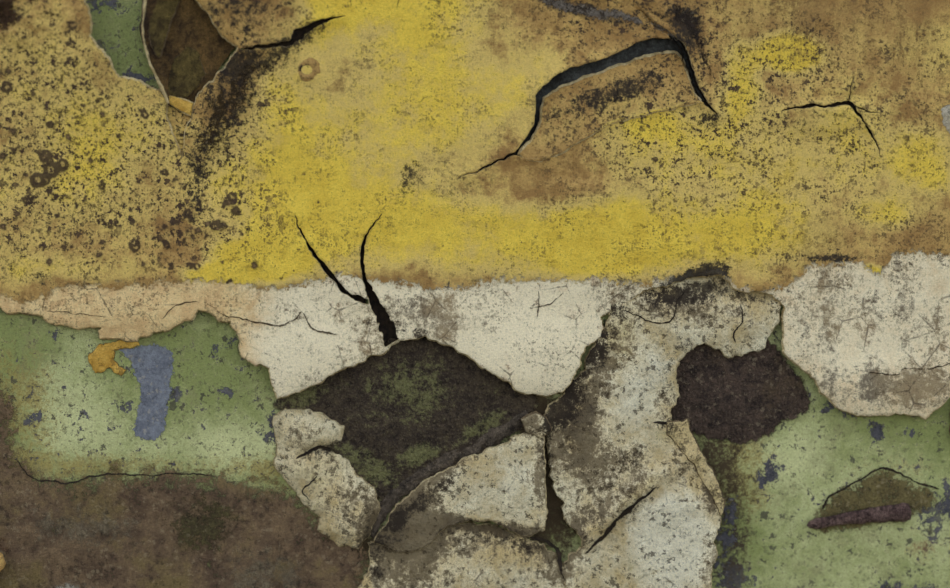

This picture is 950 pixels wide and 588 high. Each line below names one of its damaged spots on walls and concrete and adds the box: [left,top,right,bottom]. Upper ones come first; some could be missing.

crack [653,25,718,116]
crack [782,83,879,149]
crack [462,153,515,176]
peeling [0,0,950,445]
crack [296,217,397,344]
crack [625,291,685,324]
crack [733,305,743,342]
spalling [272,336,540,550]
peeling [358,276,781,588]
crack [585,487,656,553]
crack [529,536,566,581]